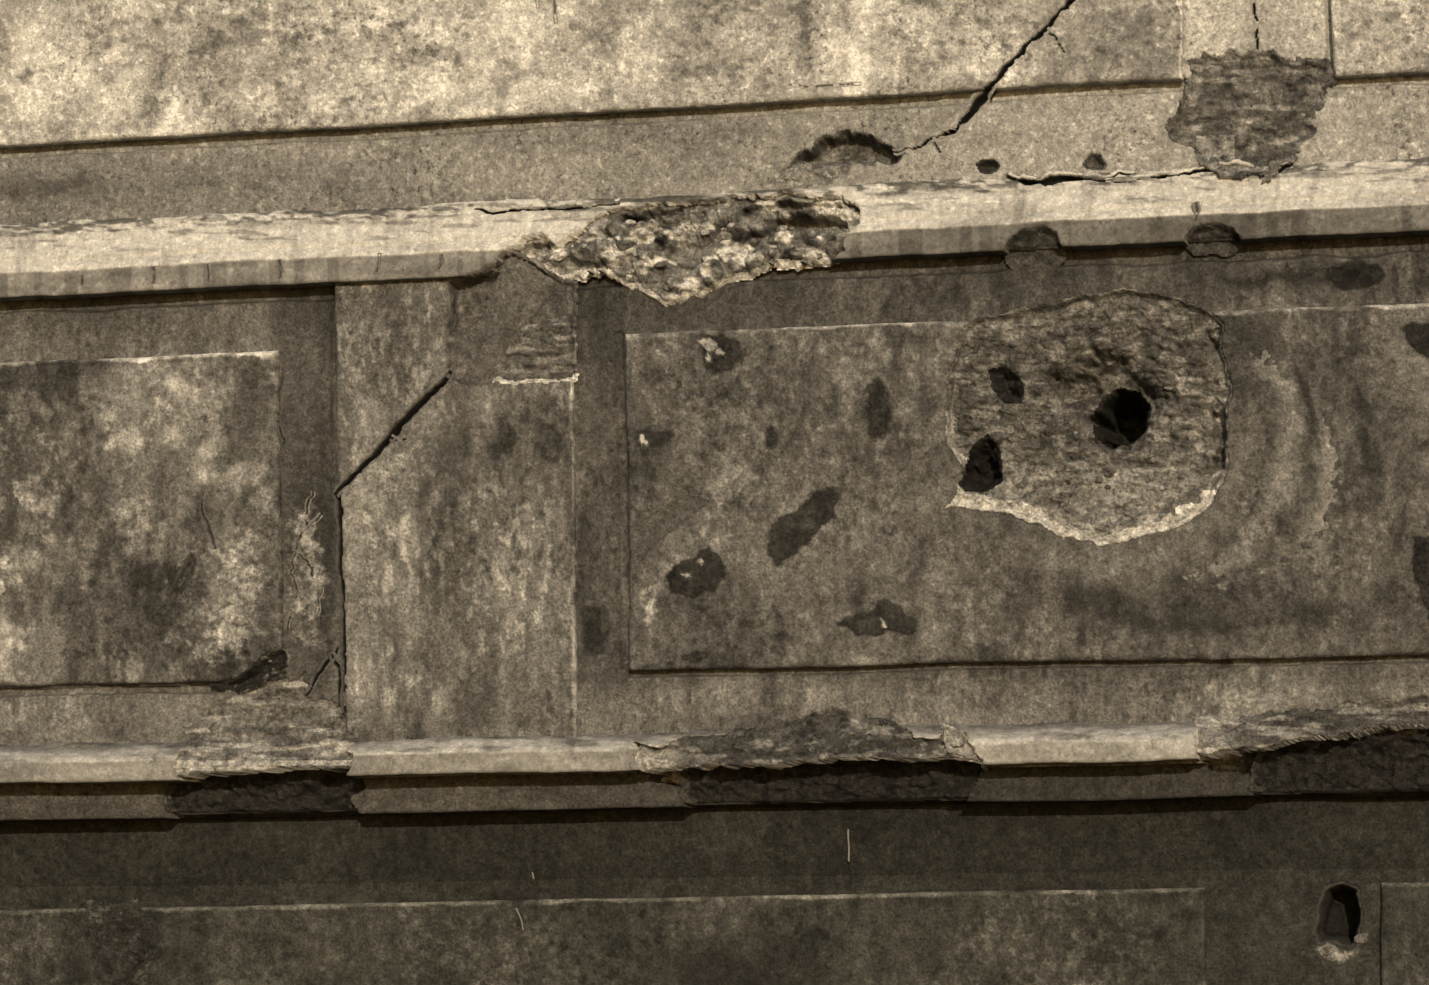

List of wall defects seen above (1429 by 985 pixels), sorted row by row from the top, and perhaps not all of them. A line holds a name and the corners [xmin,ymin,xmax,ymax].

crack [1250,0,1260,51]
crack [788,82,862,90]
crack [893,0,1078,161]
flaking render [1165,49,1338,184]
spalling [445,129,902,386]
spalling [988,365,1026,404]
spalling [958,433,1003,492]
flaking render [174,508,356,778]
spalling [635,708,993,786]
spalling [1193,694,1429,775]